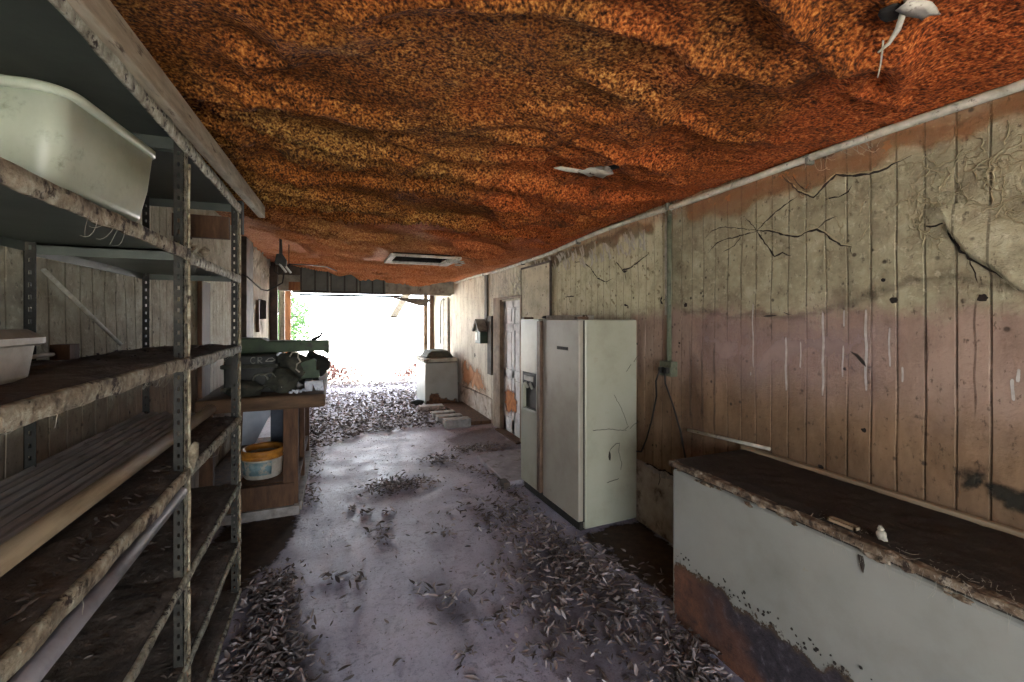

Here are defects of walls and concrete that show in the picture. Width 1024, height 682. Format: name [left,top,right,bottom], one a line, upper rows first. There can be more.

crack [705,153,912,257]
crack [576,254,648,282]
mould [960,471,1024,513]
corrosion [674,553,872,682]